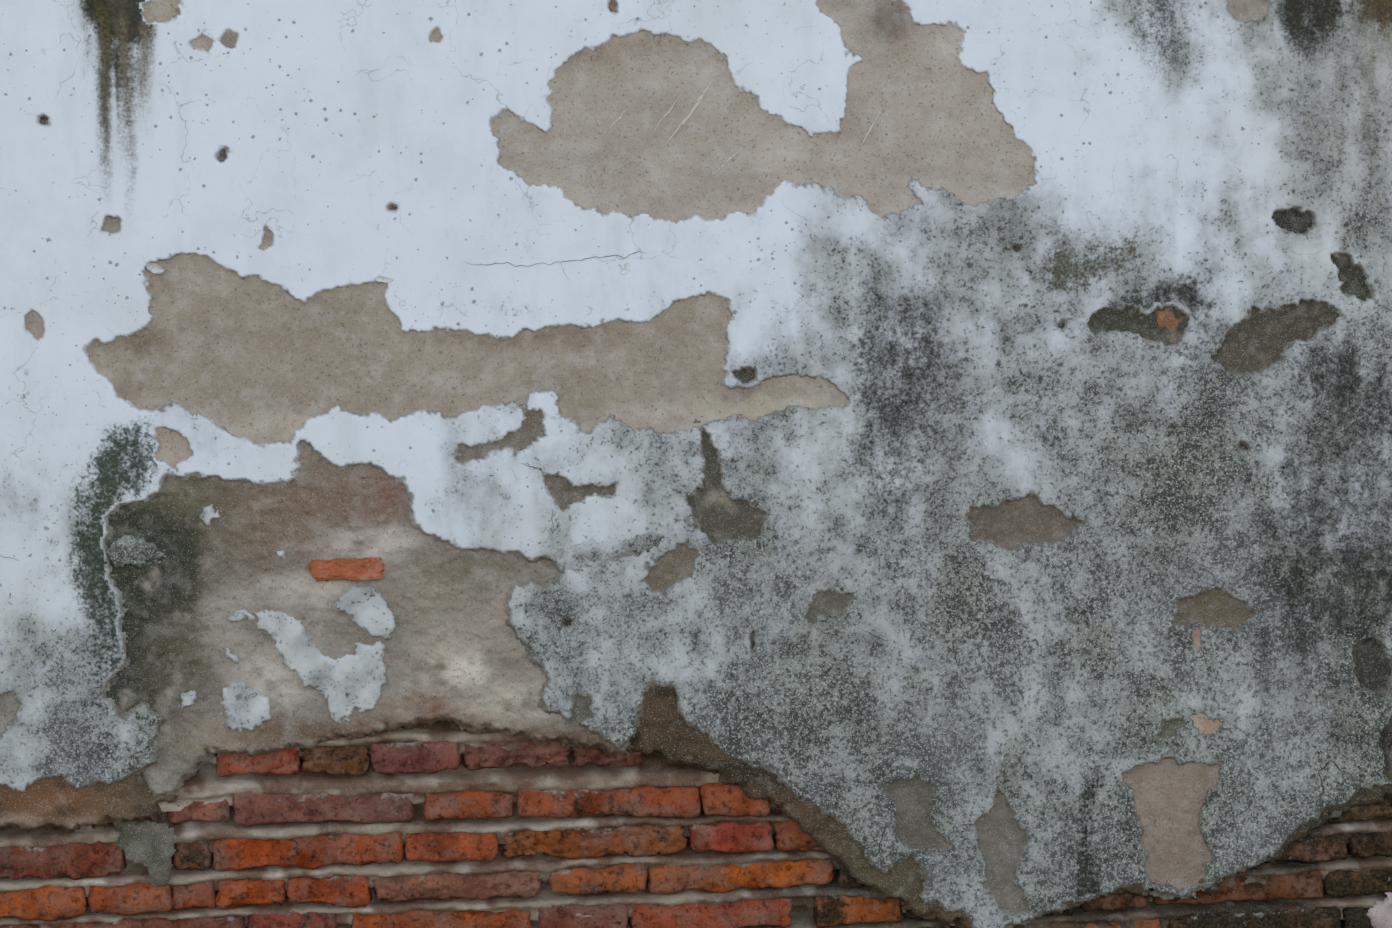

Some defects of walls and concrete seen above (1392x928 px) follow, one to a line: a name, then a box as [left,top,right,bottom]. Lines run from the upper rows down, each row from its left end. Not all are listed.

damp [81,0,154,158]
peeling [490,0,1035,222]
damp [1276,0,1392,57]
damp [1123,276,1216,327]
peeling [1211,300,1341,373]
spalling [1331,254,1372,301]
damp [843,297,955,518]
flaking render [86,253,853,797]
peeling [968,495,1081,550]
damp [1255,340,1392,651]
damp [1076,768,1103,897]
spalling [1367,892,1392,928]